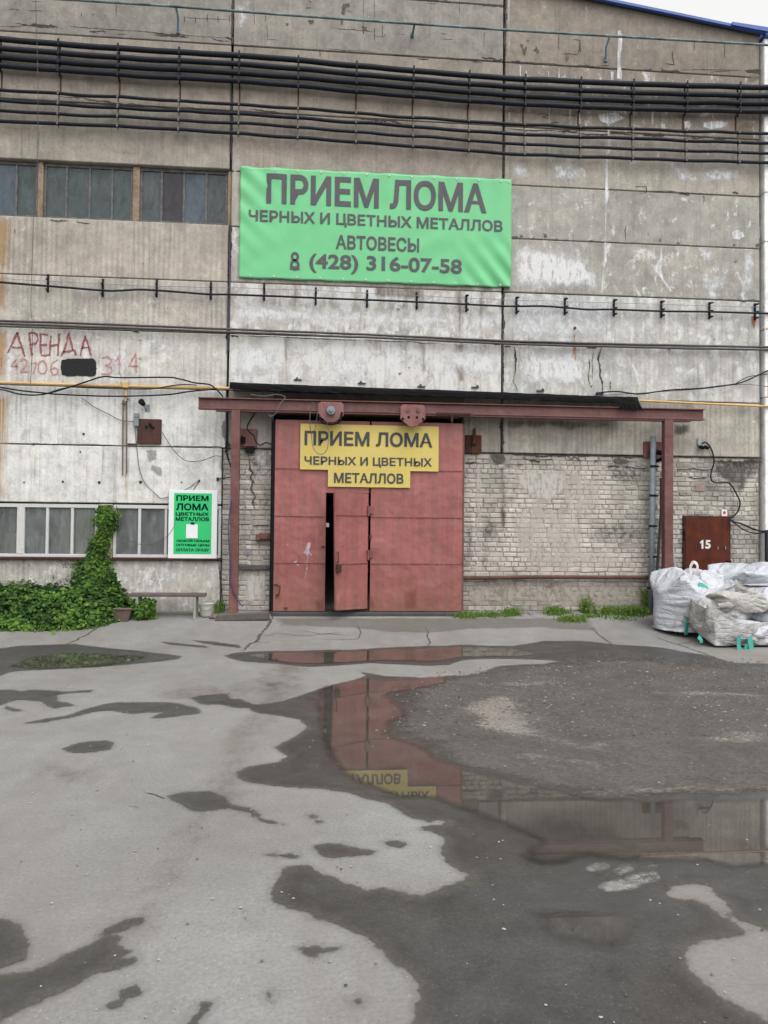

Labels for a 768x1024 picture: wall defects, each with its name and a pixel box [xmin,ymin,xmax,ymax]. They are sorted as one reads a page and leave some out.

damp [611,30,622,80]
damp [598,113,623,221]
damp [512,243,612,337]
crack [586,347,611,391]